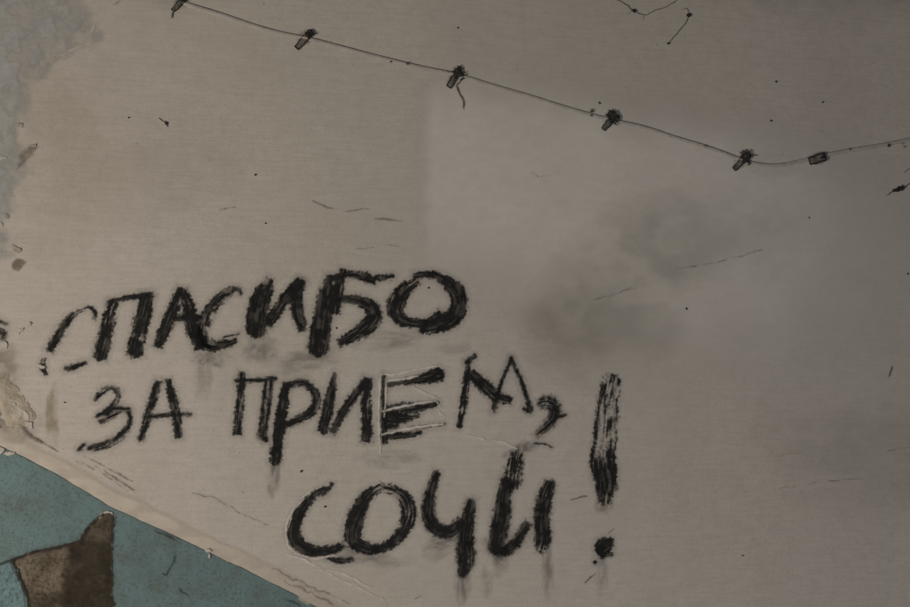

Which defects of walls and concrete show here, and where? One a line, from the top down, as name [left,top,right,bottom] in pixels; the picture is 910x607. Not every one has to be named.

spalling [10,511,116,607]